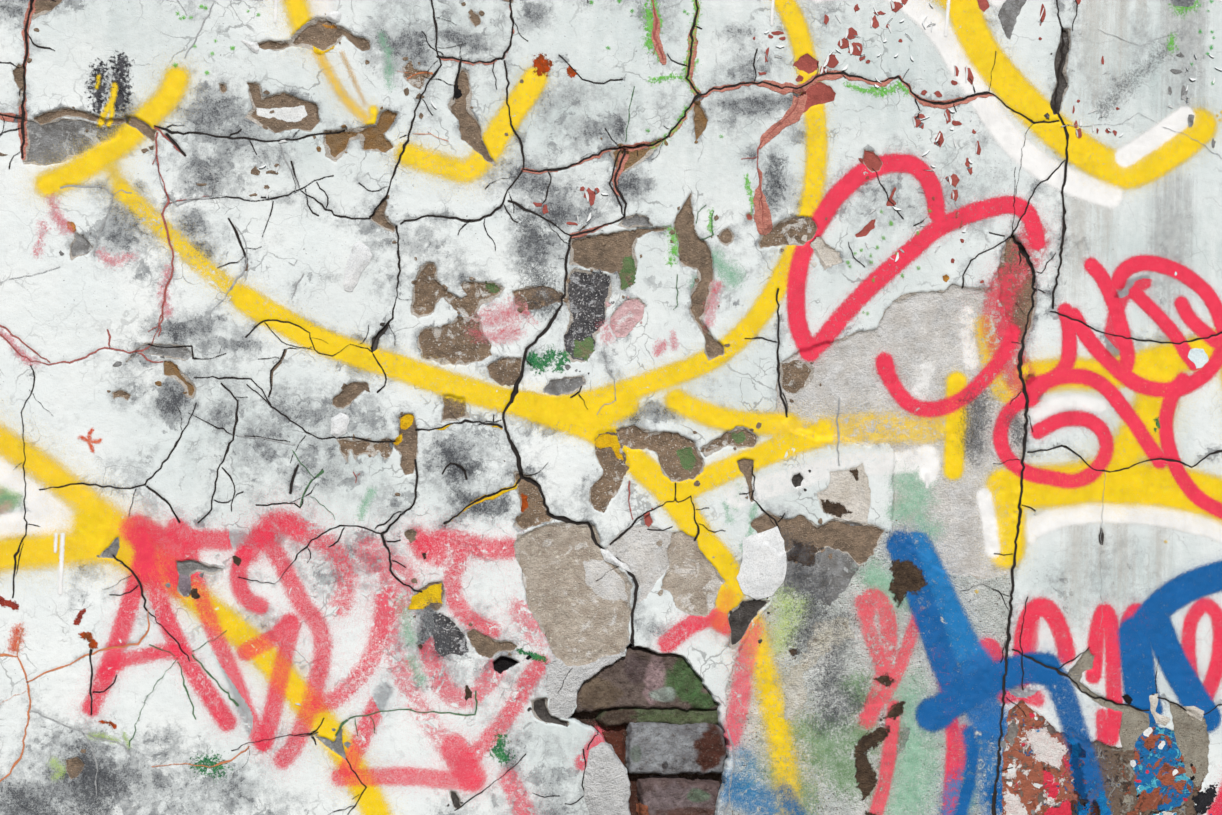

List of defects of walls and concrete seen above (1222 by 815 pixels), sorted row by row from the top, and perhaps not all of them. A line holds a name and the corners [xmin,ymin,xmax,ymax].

crack [0,0,528,365]
spalling [241,11,371,64]
spalling [244,82,397,162]
peeling [753,0,914,113]
crack [39,319,396,523]
crack [367,225,408,393]
spalling [410,186,735,396]
crack [400,0,1086,815]
crack [0,555,478,815]
crack [238,459,423,593]
peeling [408,578,532,674]
spalling [504,234,1217,815]